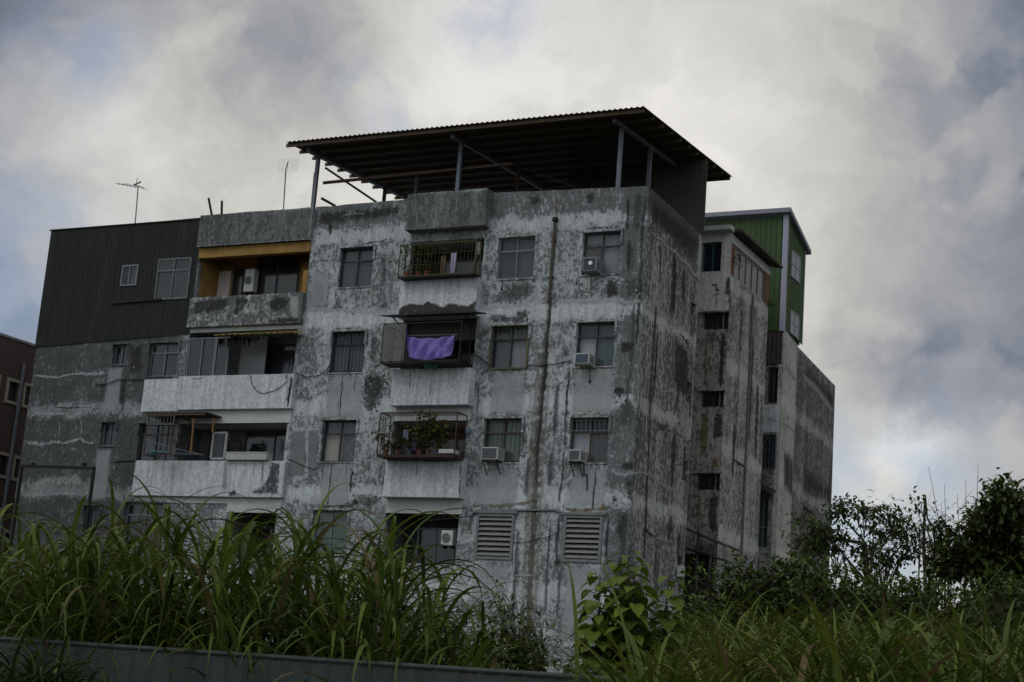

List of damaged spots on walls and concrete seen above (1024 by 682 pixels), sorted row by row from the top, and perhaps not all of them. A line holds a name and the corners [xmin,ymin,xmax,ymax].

damp [193,296,250,315]
damp [28,405,94,446]
damp [265,194,697,645]
damp [253,463,280,494]